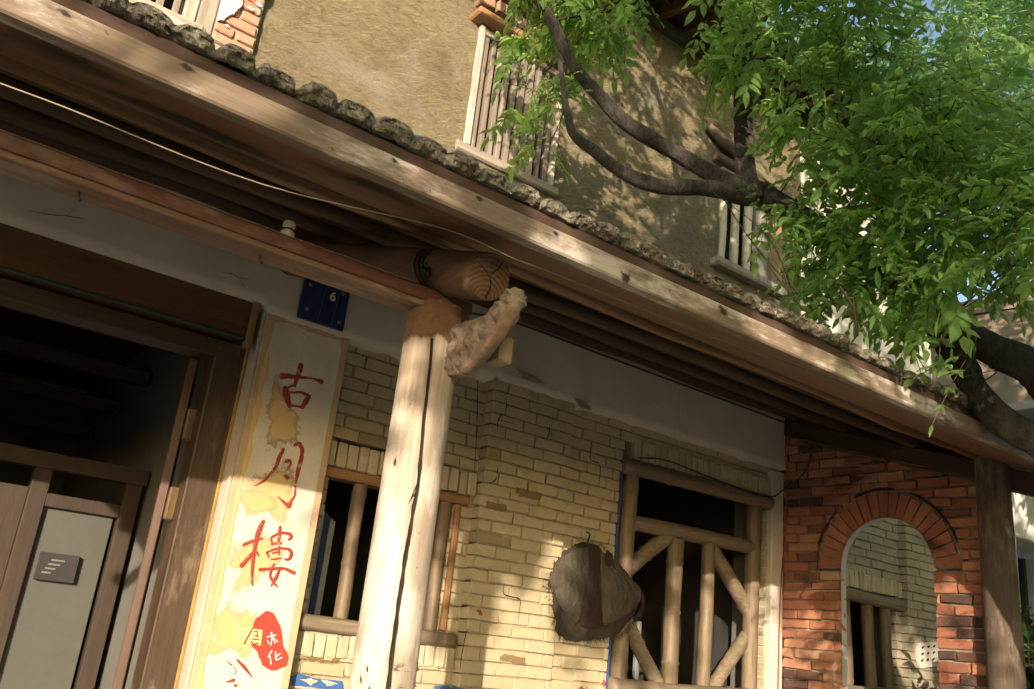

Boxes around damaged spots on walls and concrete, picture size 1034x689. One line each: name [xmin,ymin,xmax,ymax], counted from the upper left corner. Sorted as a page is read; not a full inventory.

spalling [211,0,266,55]
crack [386,338,433,689]